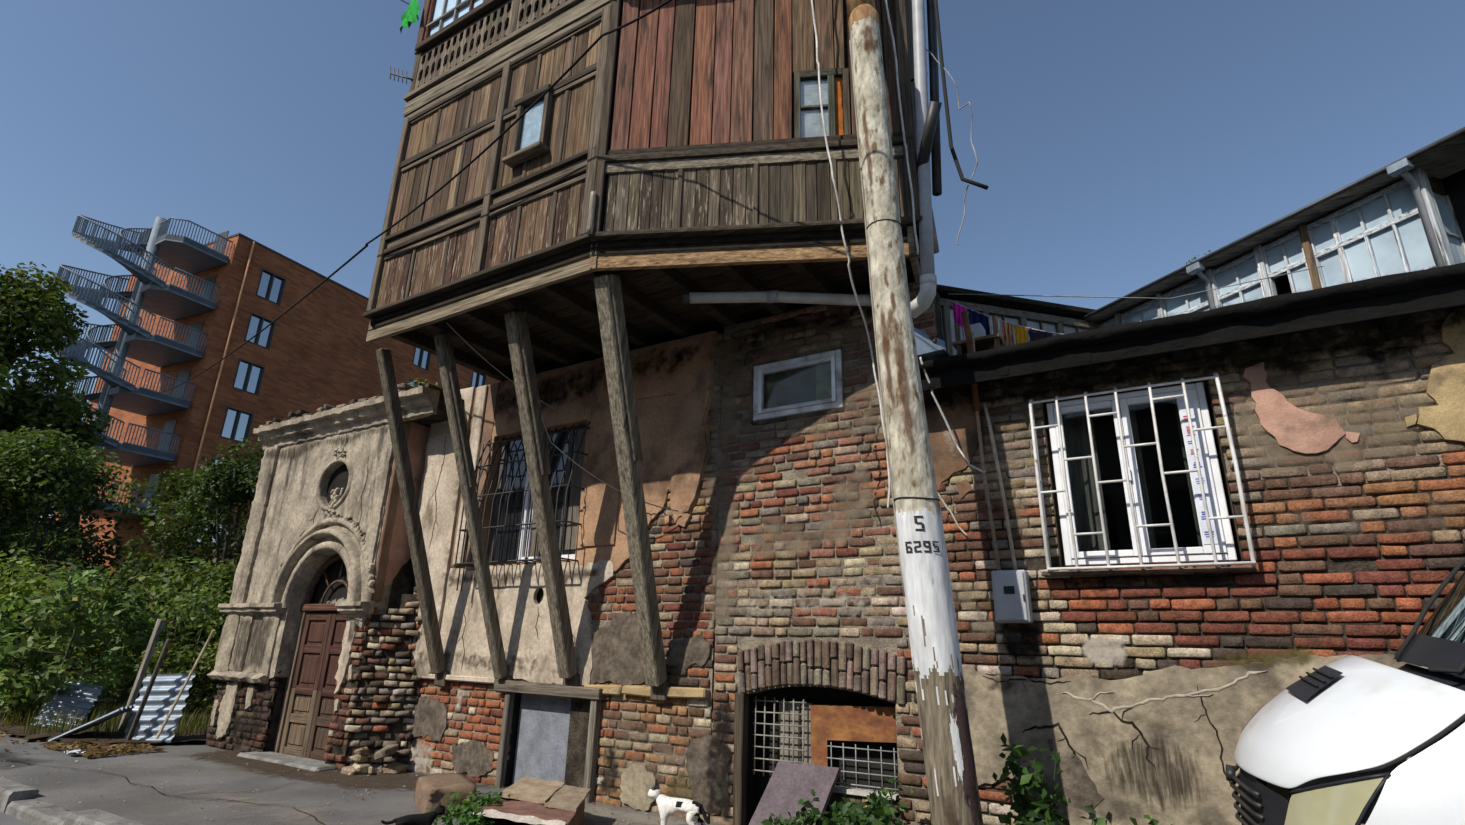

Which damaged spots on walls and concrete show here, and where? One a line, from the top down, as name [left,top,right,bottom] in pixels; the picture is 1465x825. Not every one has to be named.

peeling [1243,362,1360,455]
peeling [1403,314,1465,443]
peeling [665,511,692,527]
crack [983,670,1267,797]